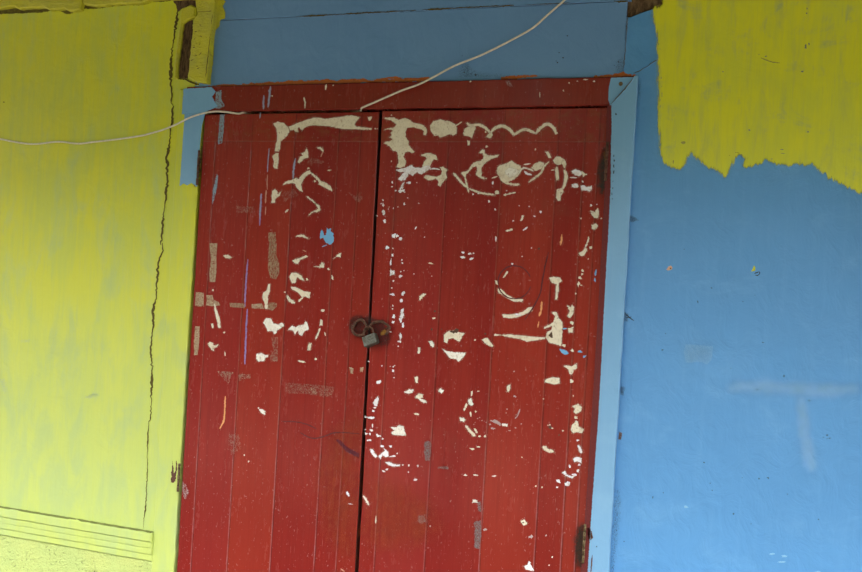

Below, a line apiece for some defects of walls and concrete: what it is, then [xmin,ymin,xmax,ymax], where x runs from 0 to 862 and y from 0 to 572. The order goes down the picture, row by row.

crack [0,5,134,14]
peeling [270,115,593,223]
crack [143,0,213,530]
peeling [194,232,326,363]
peeling [385,233,405,347]
peeling [417,310,467,362]
peeling [495,256,533,319]
peeling [474,305,575,352]
peeling [543,363,577,385]
peeling [365,396,418,481]
peeling [459,391,522,450]
peeling [548,395,585,488]